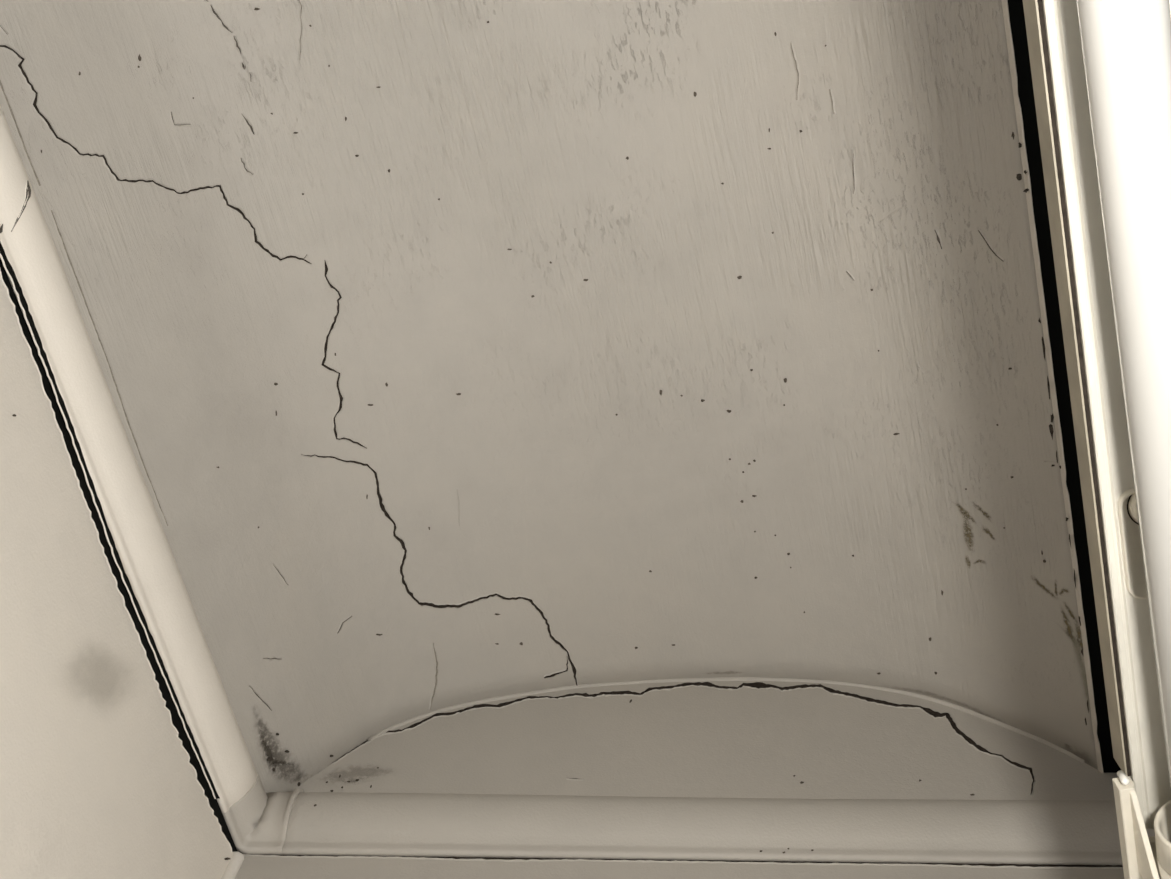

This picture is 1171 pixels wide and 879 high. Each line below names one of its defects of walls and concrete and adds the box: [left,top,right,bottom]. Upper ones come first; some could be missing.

crack [204,0,253,82]
crack [296,0,304,61]
crack [0,23,1036,795]